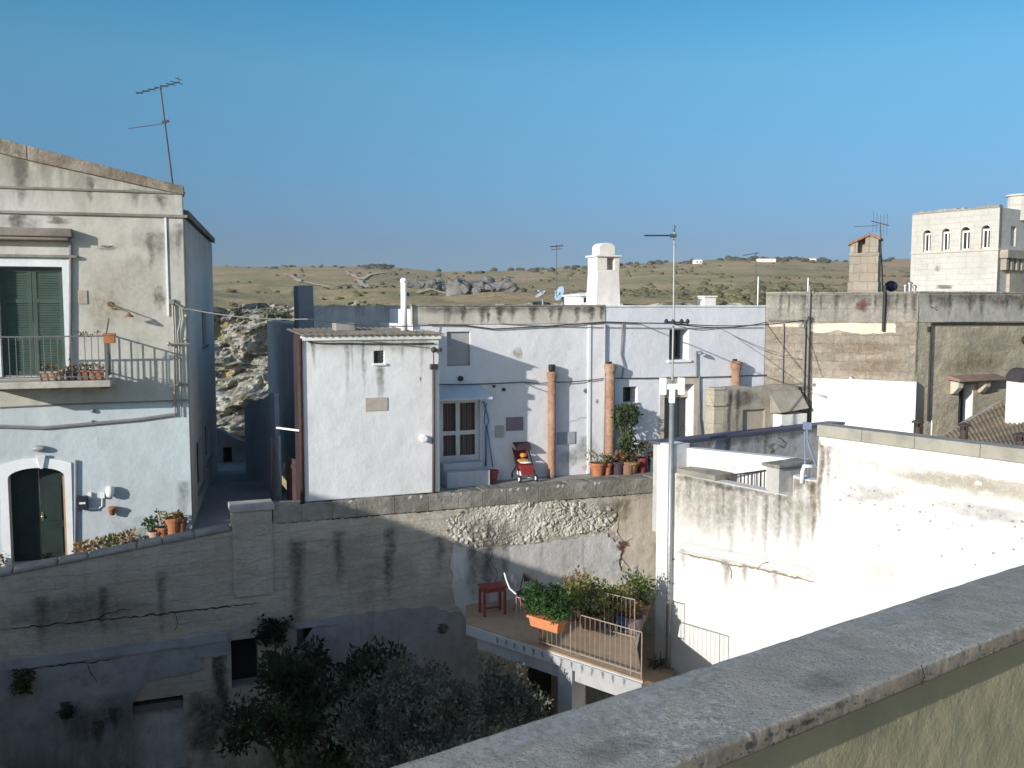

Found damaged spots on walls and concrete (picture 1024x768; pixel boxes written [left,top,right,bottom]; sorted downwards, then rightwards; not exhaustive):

spalling [446,484,617,548]
leakage [778,443,829,532]
crack [0,602,256,632]